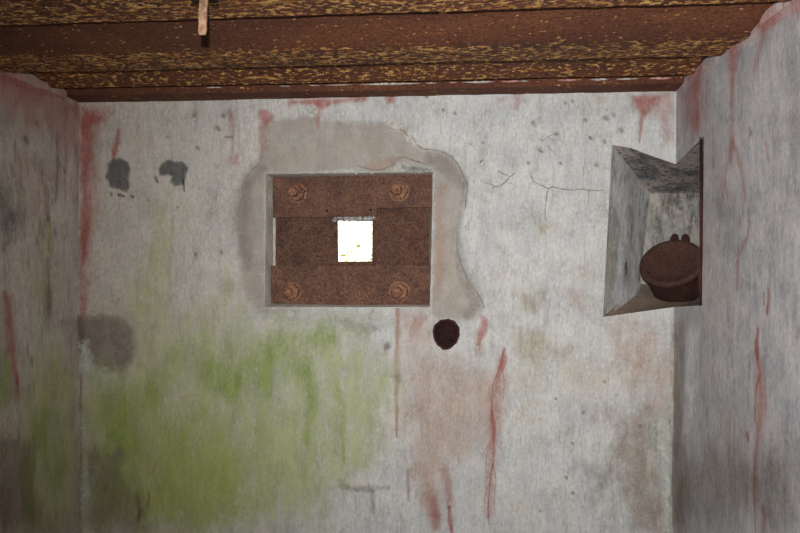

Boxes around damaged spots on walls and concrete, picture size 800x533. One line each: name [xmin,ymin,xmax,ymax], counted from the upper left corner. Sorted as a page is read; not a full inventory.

crack [481,160,604,222]